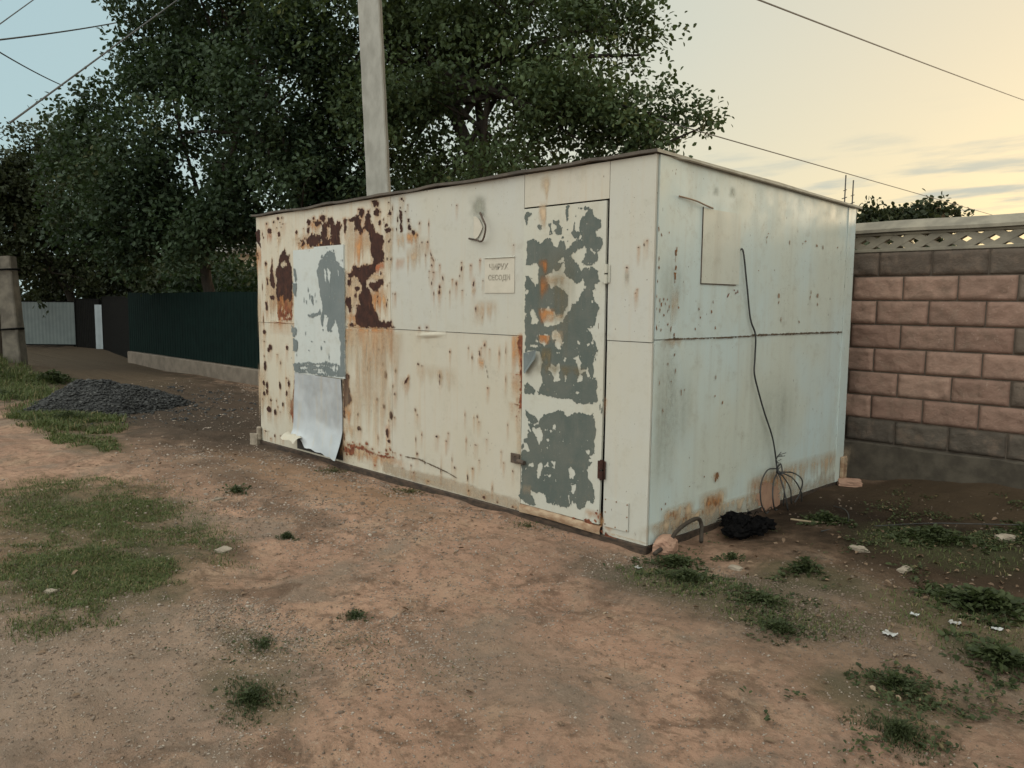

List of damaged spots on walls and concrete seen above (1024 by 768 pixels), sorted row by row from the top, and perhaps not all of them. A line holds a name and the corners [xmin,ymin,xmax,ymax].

corrosion [255,217,295,422]
peeling [291,247,345,377]
corrosion [343,374,361,451]
corrosion [295,198,480,395]
corrosion [505,335,523,426]
peeling [518,205,603,510]
corrosion [661,457,832,530]